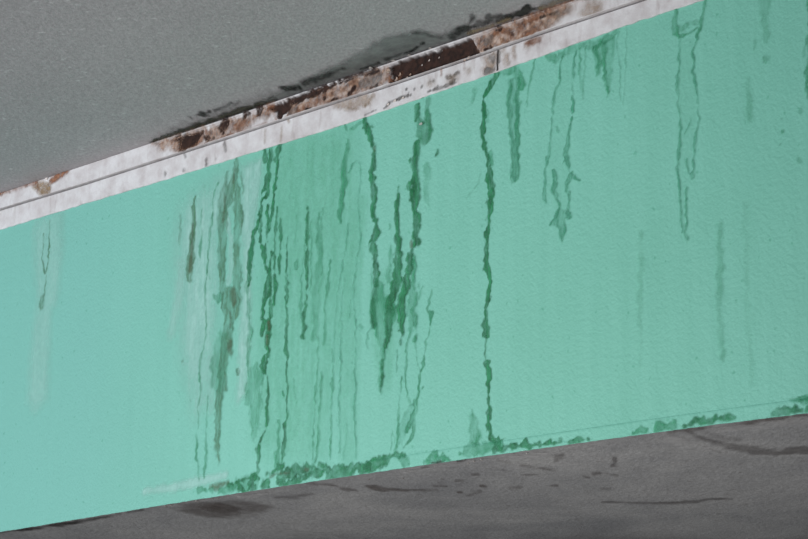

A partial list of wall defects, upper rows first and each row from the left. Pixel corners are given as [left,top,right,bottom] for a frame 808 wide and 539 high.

water stain [450,0,564,39]
rust [477,0,573,52]
rust [158,130,204,151]
water stain [152,97,278,142]
rust [287,67,388,116]
water stain [337,155,347,223]
water stain [362,117,380,287]
water stain [480,47,525,338]
water stain [543,160,571,239]
water stain [384,140,420,348]
water stain [183,160,260,460]
water stain [484,360,492,440]